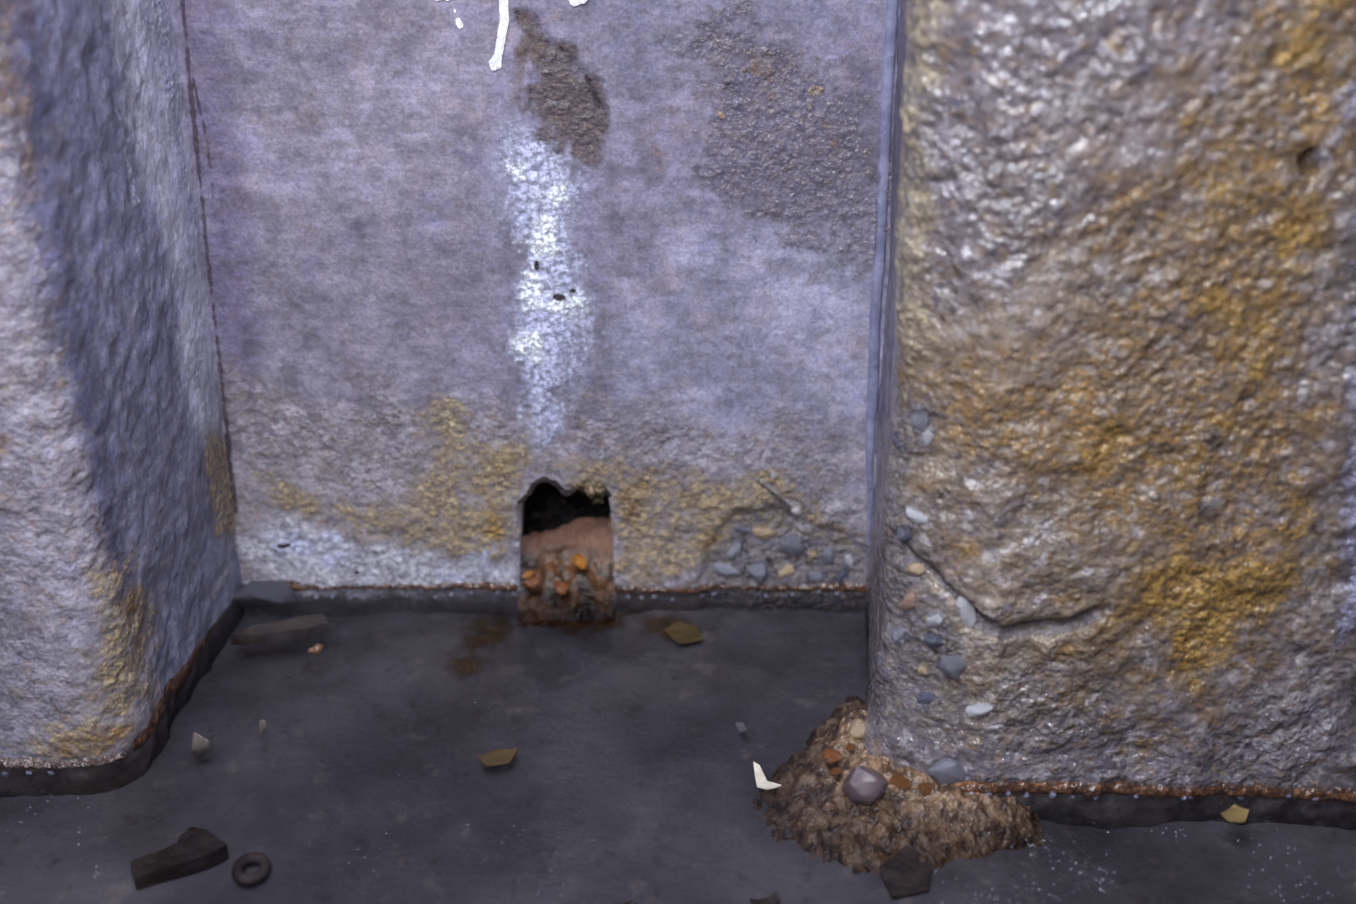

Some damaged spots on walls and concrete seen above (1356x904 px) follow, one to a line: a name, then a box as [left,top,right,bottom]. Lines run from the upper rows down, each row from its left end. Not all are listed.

damp [504,133,593,441]
rust [896,0,1356,722]
damp [205,399,525,599]
spalling [517,476,611,505]
rust [752,695,1356,875]